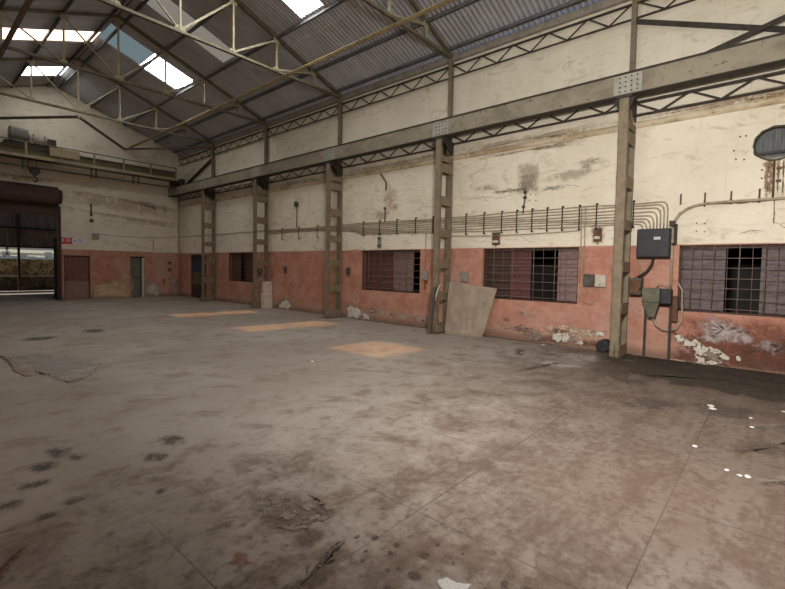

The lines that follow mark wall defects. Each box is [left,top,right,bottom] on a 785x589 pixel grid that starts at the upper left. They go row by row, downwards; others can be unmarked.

corrosion [724,161,784,223]
peeling [524,325,604,346]
peeling [670,318,782,365]
spalling [258,495,340,531]